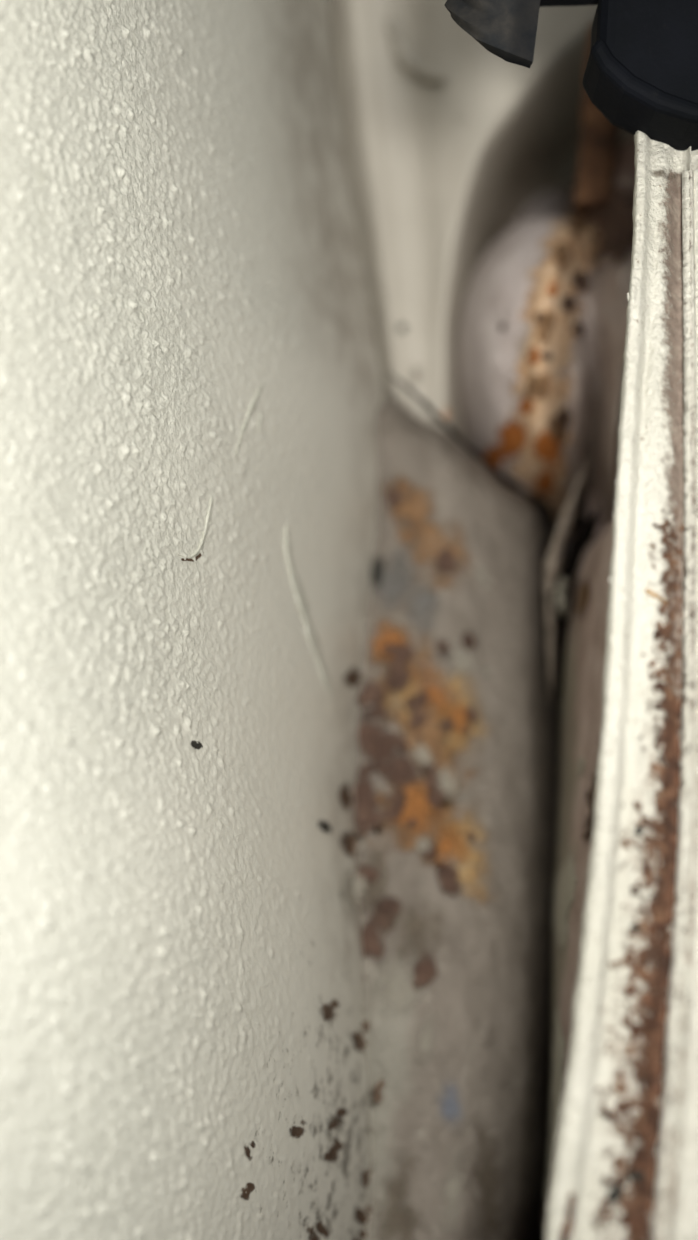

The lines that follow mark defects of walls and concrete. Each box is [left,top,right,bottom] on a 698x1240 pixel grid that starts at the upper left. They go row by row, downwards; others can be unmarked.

corrosion [482,89,634,537]
corrosion [354,621,484,895]
corrosion [581,170,698,1240]